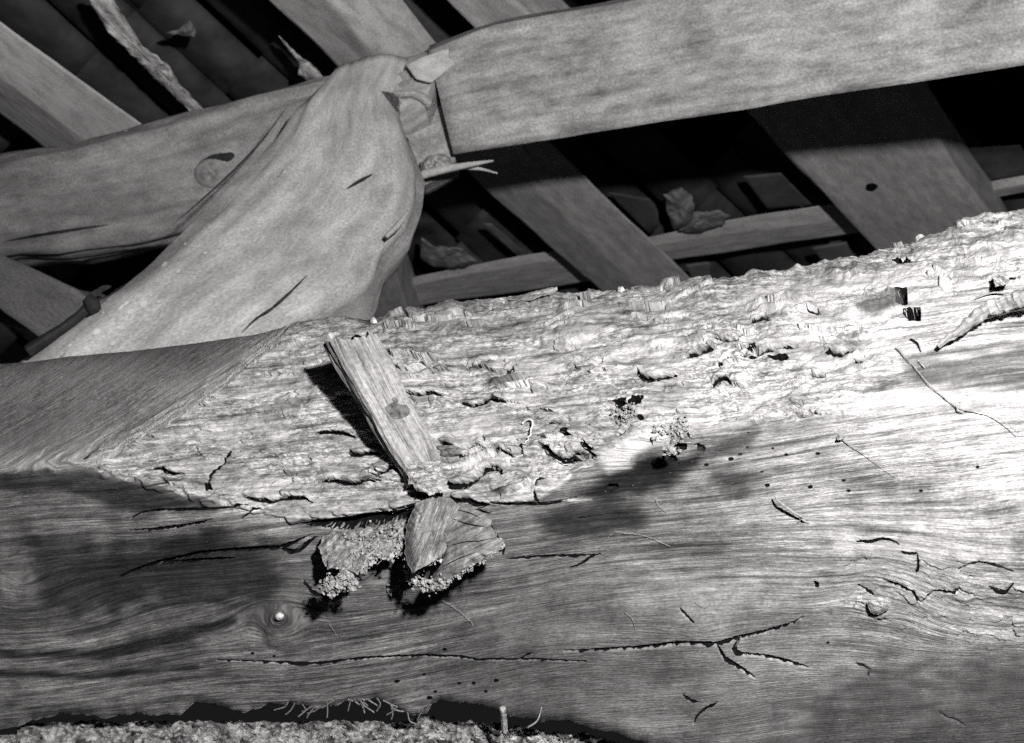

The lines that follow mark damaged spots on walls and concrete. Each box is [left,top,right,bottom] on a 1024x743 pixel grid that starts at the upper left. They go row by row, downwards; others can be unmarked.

spalling [296,502,416,530]
crack [121,533,316,576]
crack [856,537,1014,601]
crack [217,608,804,677]